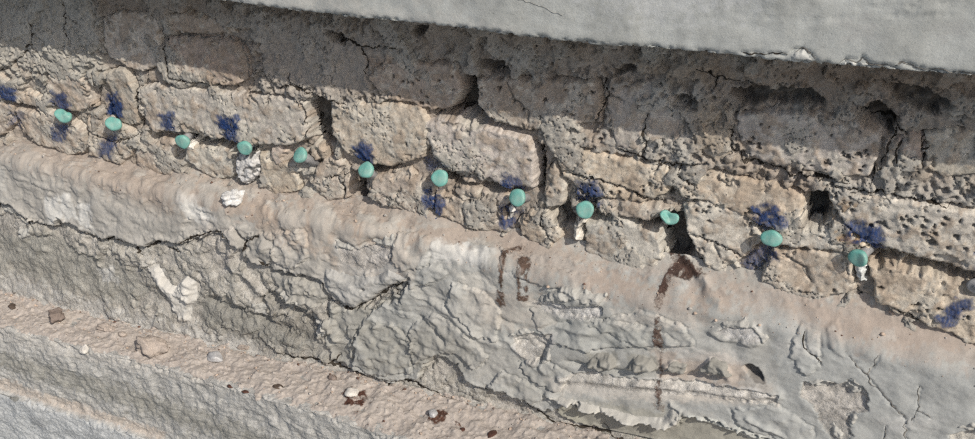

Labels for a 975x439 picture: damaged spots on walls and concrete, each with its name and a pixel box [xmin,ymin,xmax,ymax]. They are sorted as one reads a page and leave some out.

crack [743,47,815,58]
spalling [791,49,812,61]
crack [96,25,346,158]
crack [563,170,663,200]
crack [616,114,705,185]
crack [729,110,951,209]
spalling [252,291,329,340]
corrosion [496,246,532,307]
spalling [535,286,608,320]
corrosion [652,253,703,409]
spalling [558,352,778,403]
spalling [800,379,869,439]